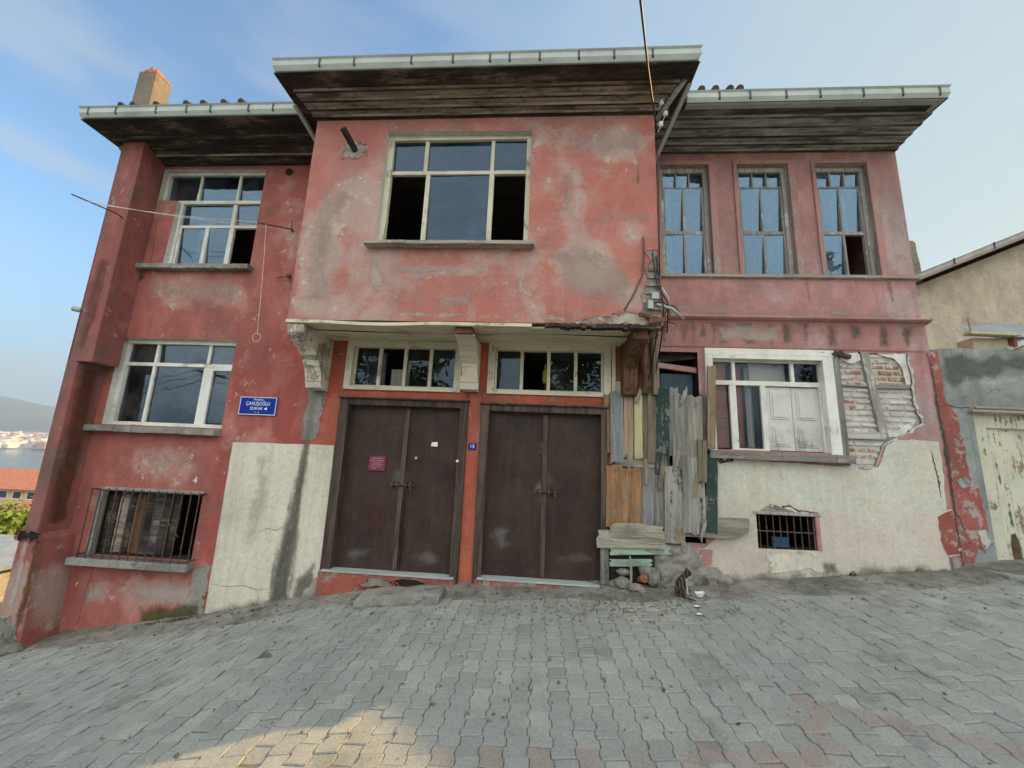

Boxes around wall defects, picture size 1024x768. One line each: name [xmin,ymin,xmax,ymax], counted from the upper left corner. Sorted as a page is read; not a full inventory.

flaking render [340,140,369,160]
flaking render [573,248,664,326]
peeling [839,352,861,364]
peeling [299,386,329,444]
spalling [845,353,925,469]
flaking render [956,476,971,489]
damp [216,441,313,612]
flaking render [978,529,994,550]